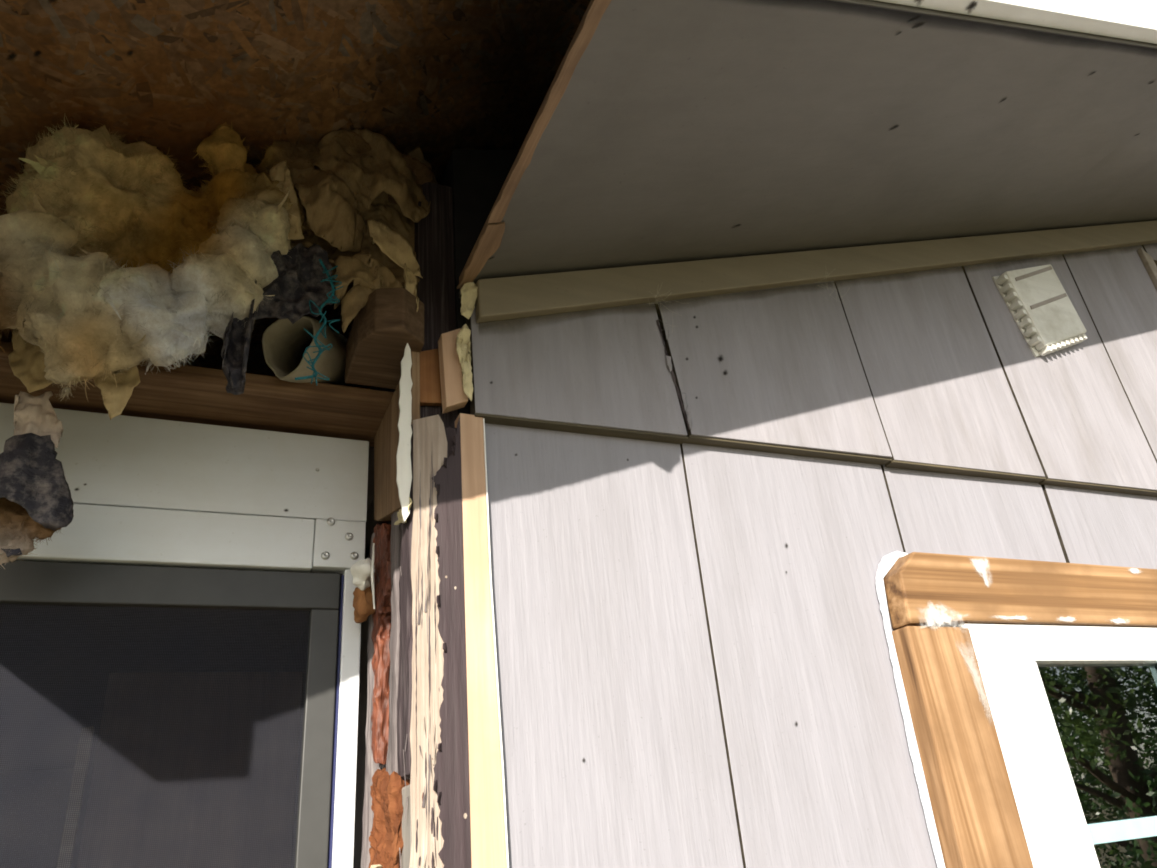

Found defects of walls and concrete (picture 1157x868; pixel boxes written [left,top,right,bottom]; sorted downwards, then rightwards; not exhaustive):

peeling [394,343,413,525]
crack [656,319,692,430]
leakage [369,523,391,764]
peeling [416,417,471,868]